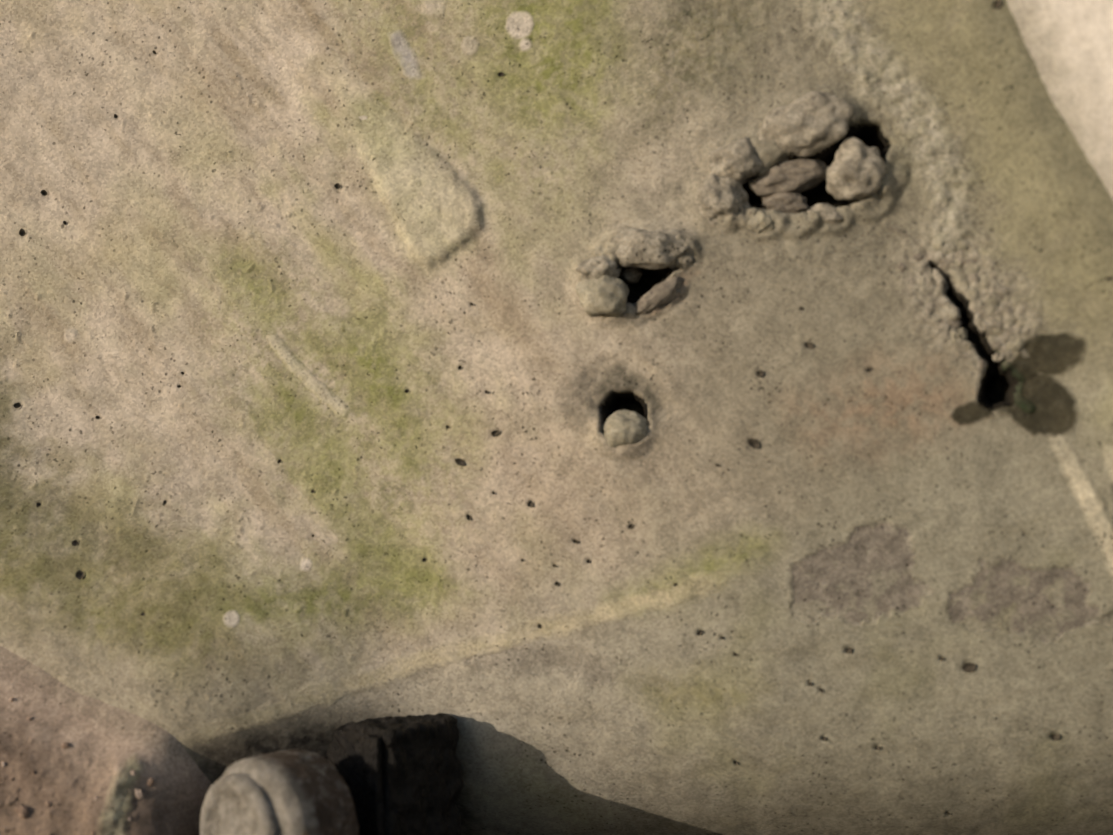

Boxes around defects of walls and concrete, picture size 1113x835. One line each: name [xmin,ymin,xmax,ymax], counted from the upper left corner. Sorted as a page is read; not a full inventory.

spalling [695,91,888,234]
spalling [575,228,694,317]
crack [883,221,1002,385]
water stain [0,355,164,577]
spalling [590,352,677,448]
water stain [950,330,1090,441]